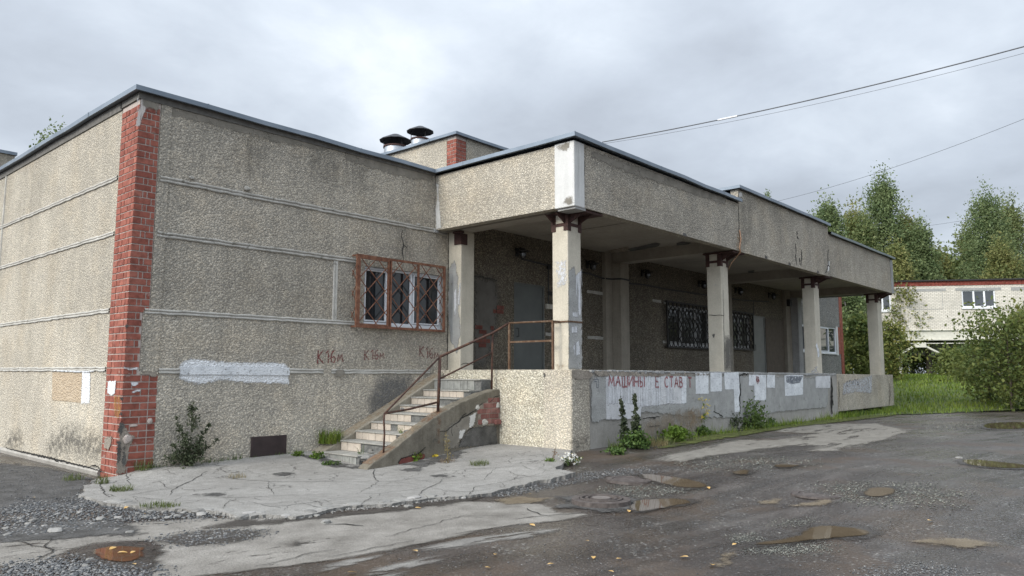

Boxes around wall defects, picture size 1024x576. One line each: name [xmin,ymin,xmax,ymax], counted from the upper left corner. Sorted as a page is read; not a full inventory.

spalling [104,397,135,474]
spalling [444,397,500,448]